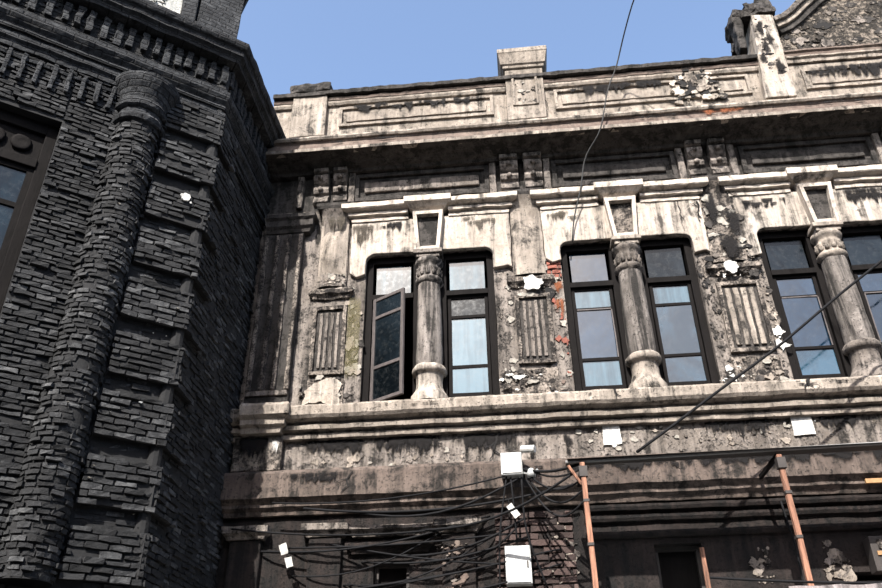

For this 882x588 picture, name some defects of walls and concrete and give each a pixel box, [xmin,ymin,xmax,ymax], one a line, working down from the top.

water stain [756,21,785,71]
flaking render [751,0,882,74]
water stain [354,96,479,112]
flaking render [669,66,728,105]
flaking render [696,191,793,383]
flaking render [298,287,365,405]
flaking render [499,358,573,392]
water stain [307,439,363,455]
water stain [375,435,442,456]
water stain [458,433,516,453]
water stain [290,472,342,483]
flaking render [822,539,857,581]